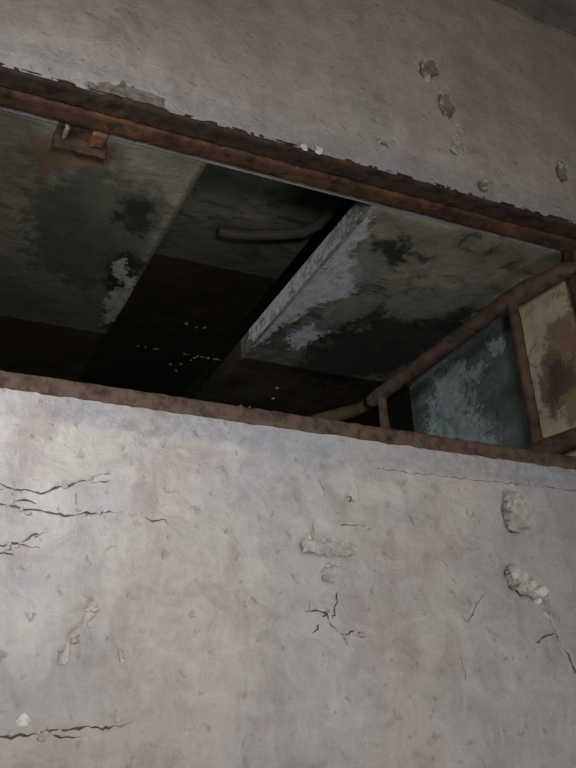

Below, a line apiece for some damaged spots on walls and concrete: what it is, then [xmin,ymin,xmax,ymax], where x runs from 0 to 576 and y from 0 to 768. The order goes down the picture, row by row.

spalling [88,80,165,108]
leakage [248,205,485,387]
crack [0,471,122,558]
crack [144,516,175,529]
spalling [501,491,532,533]
spalling [503,563,551,604]
crack [535,598,576,678]
crack [0,717,134,745]